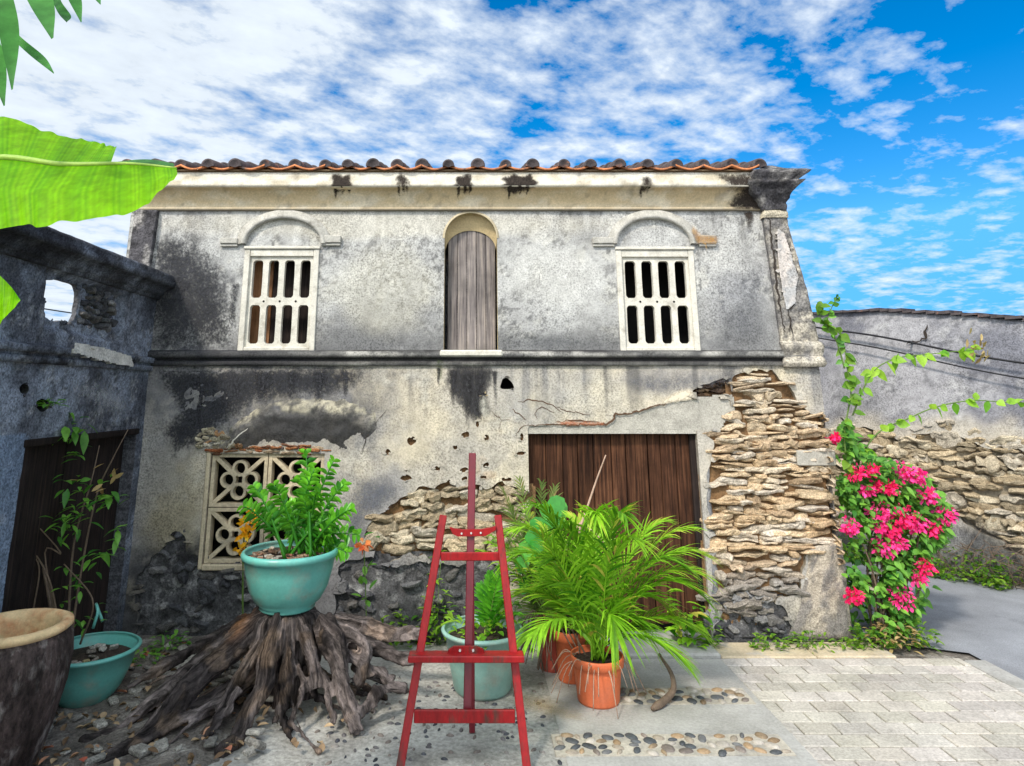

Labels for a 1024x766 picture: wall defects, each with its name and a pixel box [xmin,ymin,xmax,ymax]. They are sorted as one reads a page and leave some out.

damp [332,174,352,197]
damp [455,174,472,197]
damp [502,174,538,199]
damp [153,238,239,349]
peeling [774,229,799,310]
damp [162,366,360,455]
damp [437,365,497,420]
spalling [453,419,489,451]
crack [495,399,679,435]
spalling [687,367,1024,643]
spalling [129,529,257,637]
spalling [332,467,536,643]